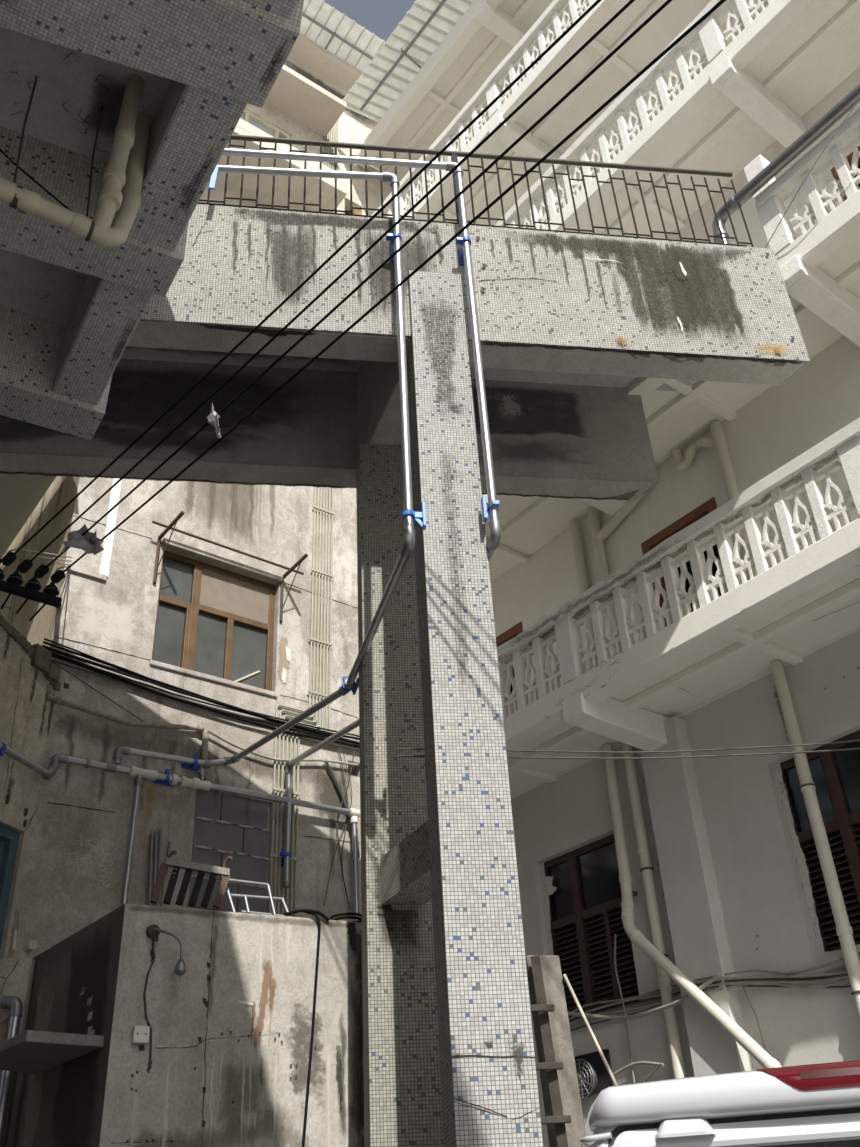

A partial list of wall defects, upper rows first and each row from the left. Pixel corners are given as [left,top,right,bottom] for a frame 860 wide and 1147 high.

water stain [62,74,126,152]
water stain [233,208,443,307]
water stain [491,233,744,334]
water stain [422,304,463,414]
crack [155,915,276,1136]
rust [251,961,275,1047]
water stain [289,922,364,1147]
crack [451,1052,535,1060]